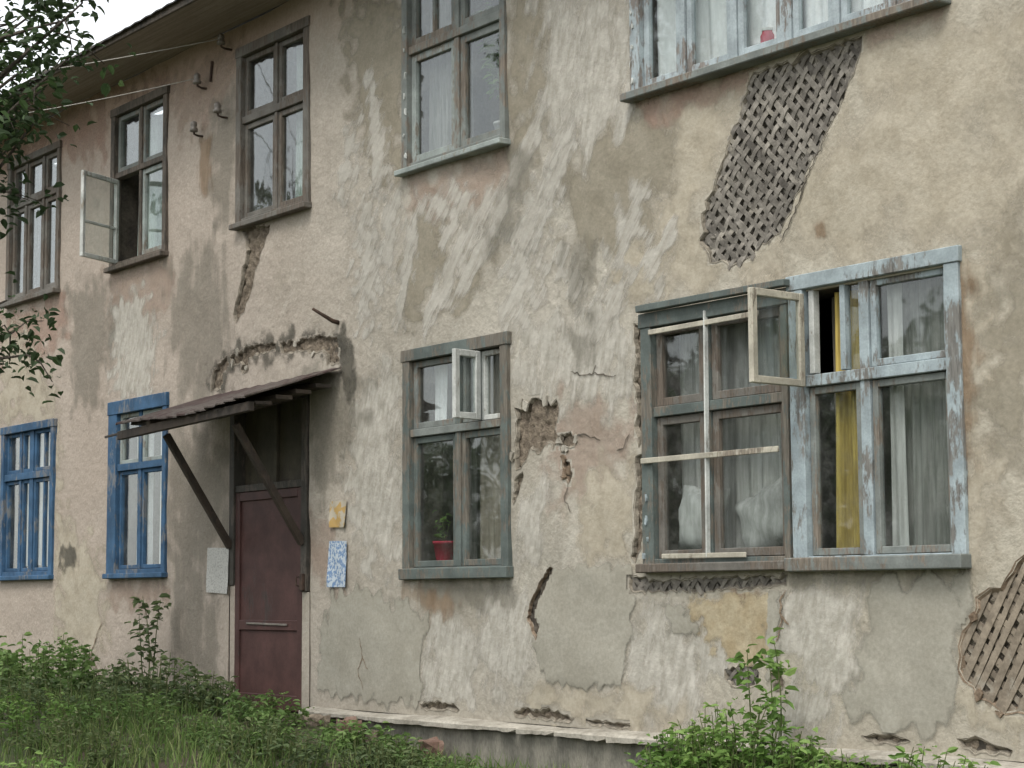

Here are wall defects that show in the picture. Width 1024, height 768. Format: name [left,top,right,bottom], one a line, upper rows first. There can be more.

spalling [698,35,862,271]
spalling [233,224,270,323]
water stain [206,70,678,400]
spalling [211,334,341,392]
crack [571,365,616,377]
spalling [509,395,578,504]
spalling [629,323,787,596]
spalling [957,555,1024,718]
spalling [419,700,459,712]
spalling [513,706,573,724]
spalling [957,736,1012,756]